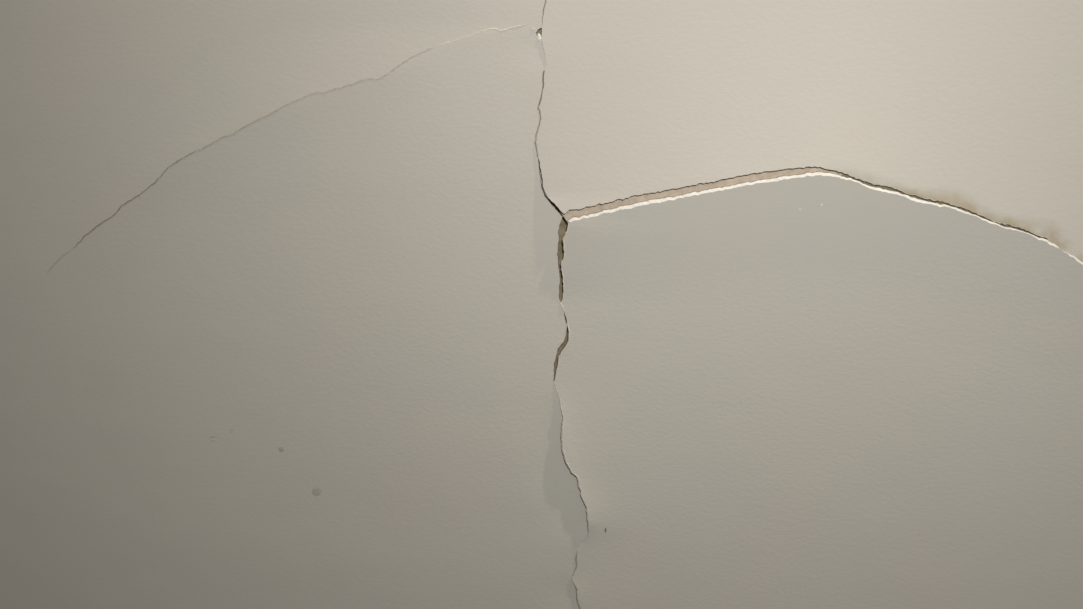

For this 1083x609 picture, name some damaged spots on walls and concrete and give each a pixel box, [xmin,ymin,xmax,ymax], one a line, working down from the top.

crack [47,0,547,273]
crack [549,166,1046,609]